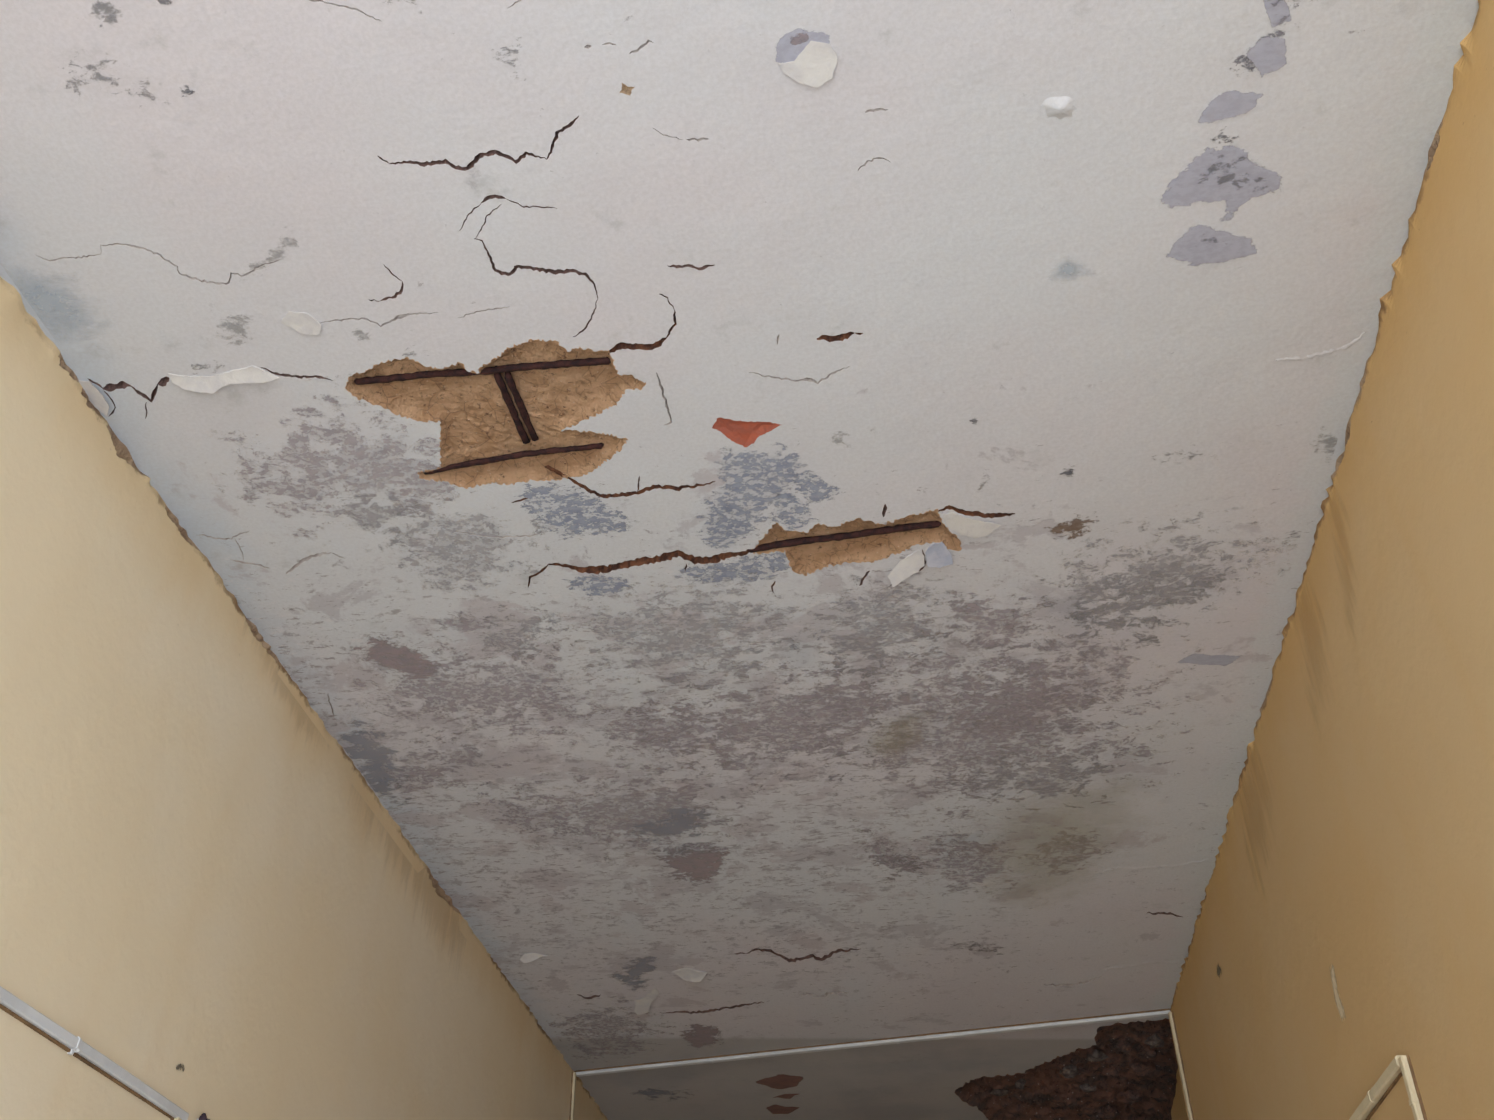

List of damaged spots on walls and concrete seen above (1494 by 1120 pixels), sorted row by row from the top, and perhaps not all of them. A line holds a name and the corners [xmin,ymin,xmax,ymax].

peeling [1199,0,1299,123]
peeling [1161,145,1283,266]
crack [320,116,714,425]
crack [88,377,169,419]
leakage [223,395,549,590]
spalling [345,339,646,540]
crack [455,465,749,587]
spalling [677,417,1001,587]
crack [938,505,1015,518]
leakage [340,515,1299,893]
leakage [549,956,721,1059]
spalling [954,1018,1178,1120]